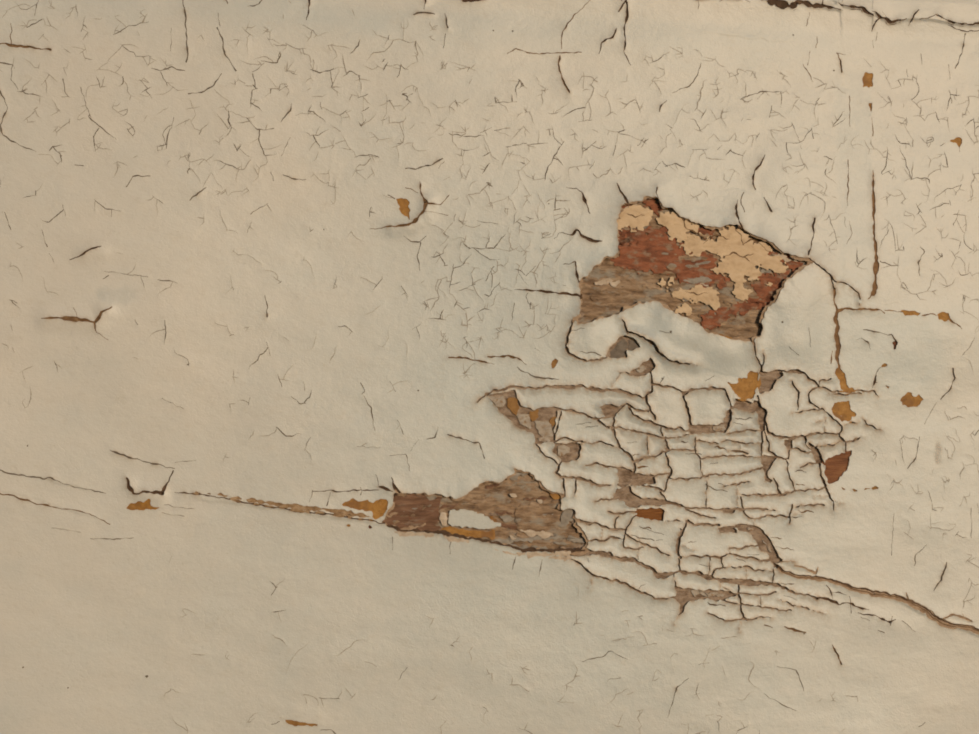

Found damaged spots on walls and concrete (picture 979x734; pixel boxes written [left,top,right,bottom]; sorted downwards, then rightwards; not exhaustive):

crack [0,382,485,550]
peeling [193,195,880,621]
crack [777,368,979,635]
crack [271,580,304,674]
crack [303,688,355,734]